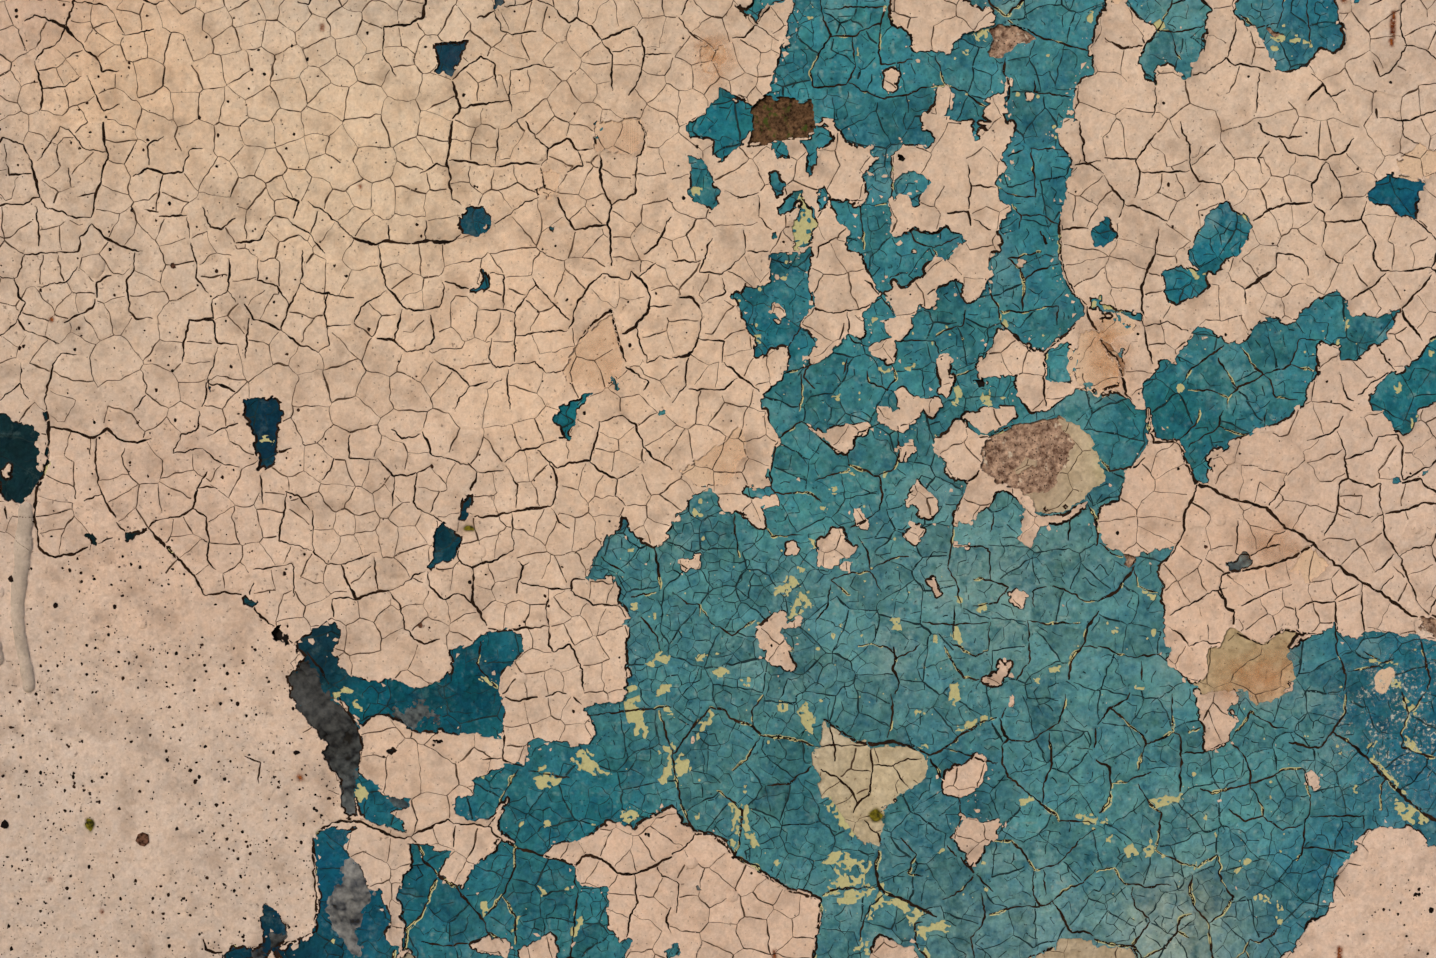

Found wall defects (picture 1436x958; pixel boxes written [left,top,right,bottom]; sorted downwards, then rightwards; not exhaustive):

crack [1095,0,1161,80]
crack [1200,284,1248,330]
peeling [0,411,49,504]
peeling [242,395,284,471]
peeling [396,0,1436,958]
crack [940,421,982,463]
crack [979,409,1016,438]
crack [446,630,472,660]
peeling [285,621,524,833]
crack [244,756,261,783]
peeling [224,826,414,958]
crack [202,939,264,958]